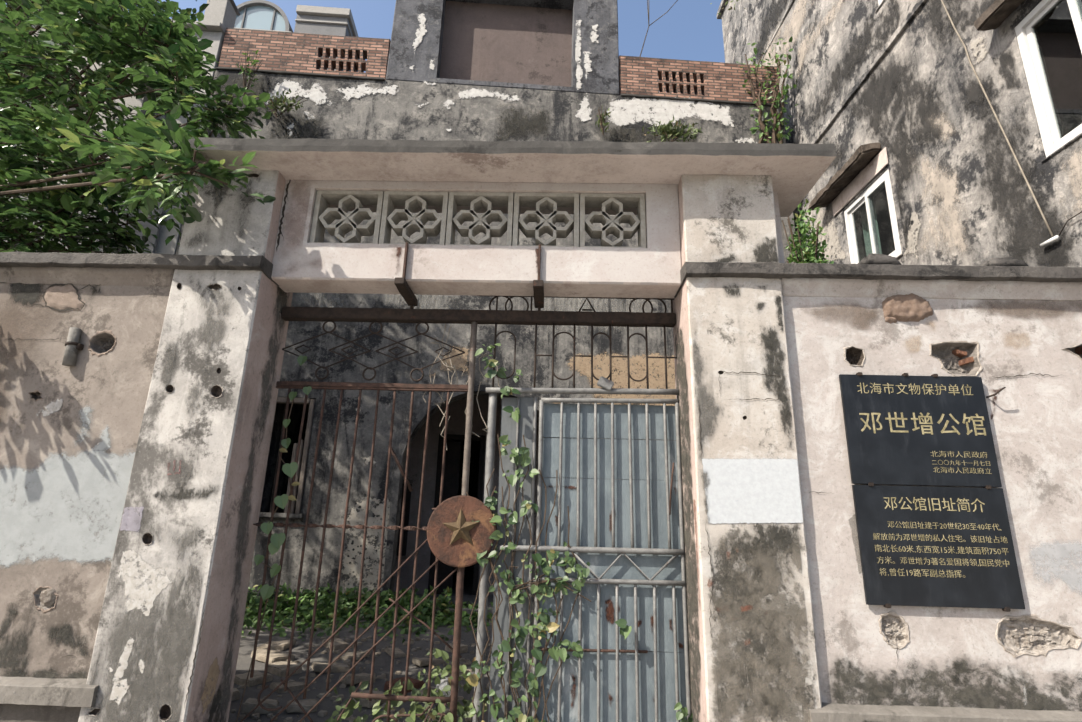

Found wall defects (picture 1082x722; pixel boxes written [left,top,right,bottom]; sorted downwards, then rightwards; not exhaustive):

mould [753,0,787,61]
peeling [443,88,520,109]
mould [809,0,949,249]
mould [960,51,1074,267]
spalling [929,341,984,377]
leakage [675,329,817,722]
peeling [117,550,172,616]
leakage [0,528,202,722]
spalling [878,610,910,650]
spalling [995,614,1082,658]
peeling [87,637,144,722]
leakage [829,659,1082,712]